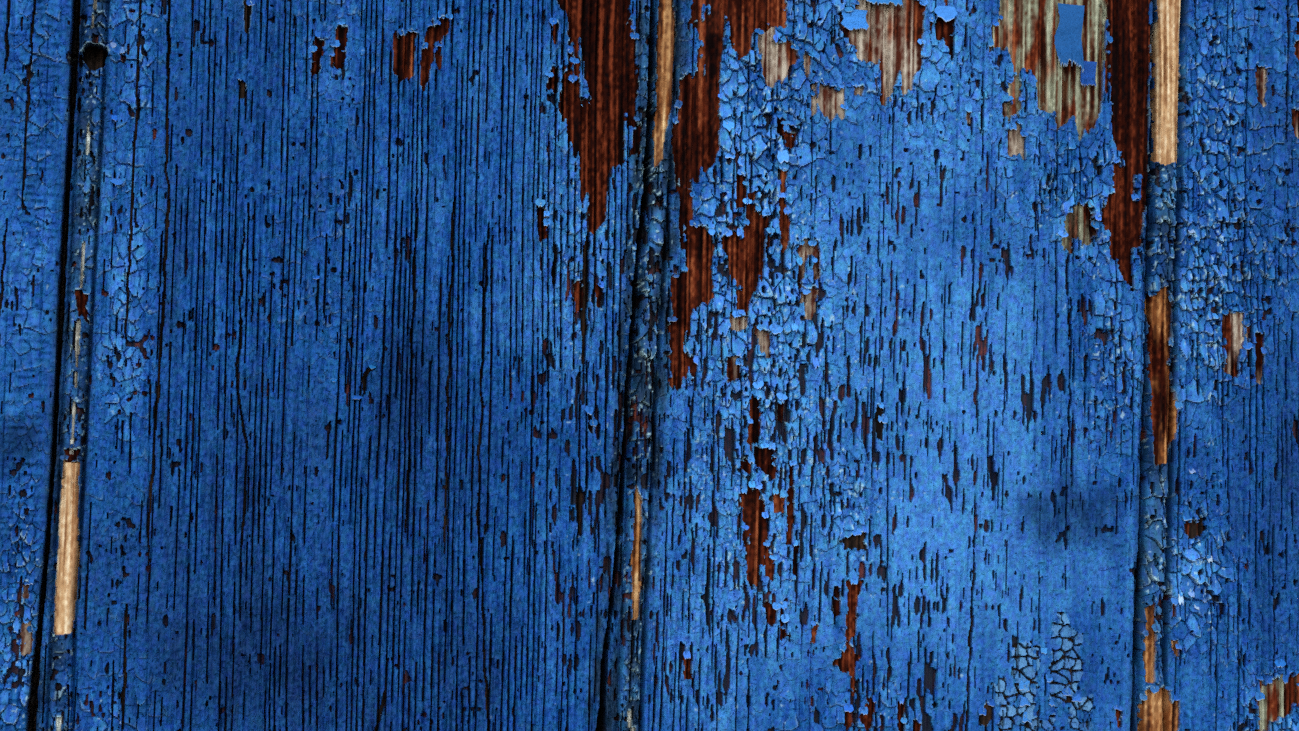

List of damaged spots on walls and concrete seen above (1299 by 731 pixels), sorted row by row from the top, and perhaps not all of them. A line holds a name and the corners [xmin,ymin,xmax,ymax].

peeling [311,22,347,76]
peeling [393,11,453,91]
peeling [535,198,551,242]
peeling [545,0,642,236]
peeling [667,0,957,390]
peeling [988,0,1174,302]
peeling [727,350,799,587]
peeling [843,525,866,551]
peeling [764,601,790,640]
peeling [832,577,879,731]
crack [964,563,1092,731]
peeling [1255,659,1299,731]